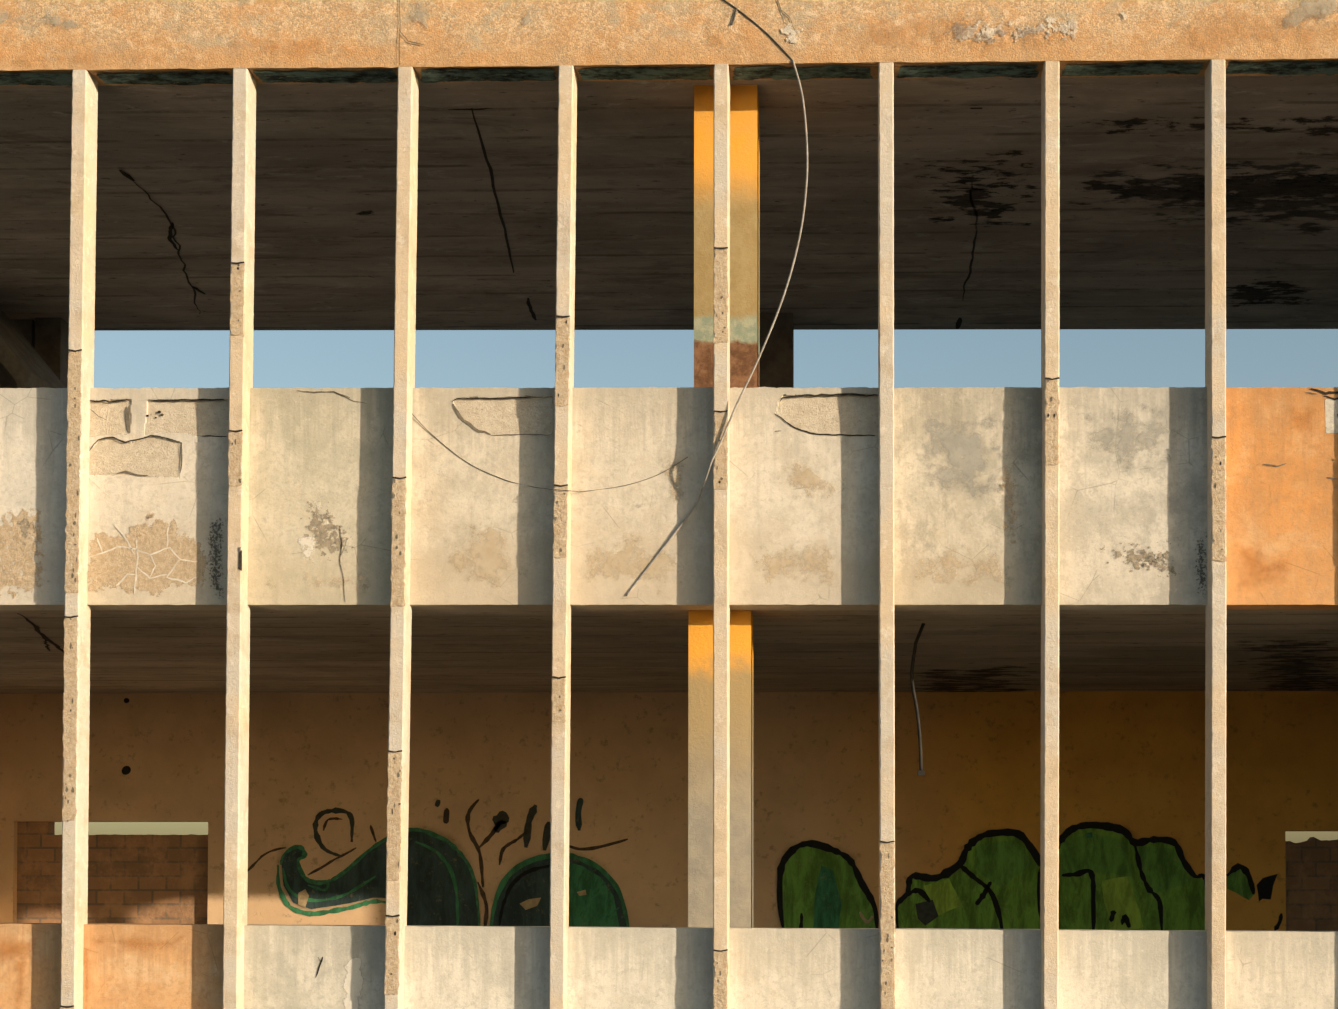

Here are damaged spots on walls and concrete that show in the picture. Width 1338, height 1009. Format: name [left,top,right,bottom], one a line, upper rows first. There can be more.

damp [1226,116,1338,136]
crack [119,170,205,314]
crack [448,108,537,320]
crack [951,177,997,329]
damp [916,150,1037,227]
damp [1068,164,1205,224]
damp [1226,153,1338,235]
spalling [452,315,570,436]
spalling [775,393,879,436]
peeling [64,349,243,597]
peeling [0,508,47,598]
crack [17,613,64,653]